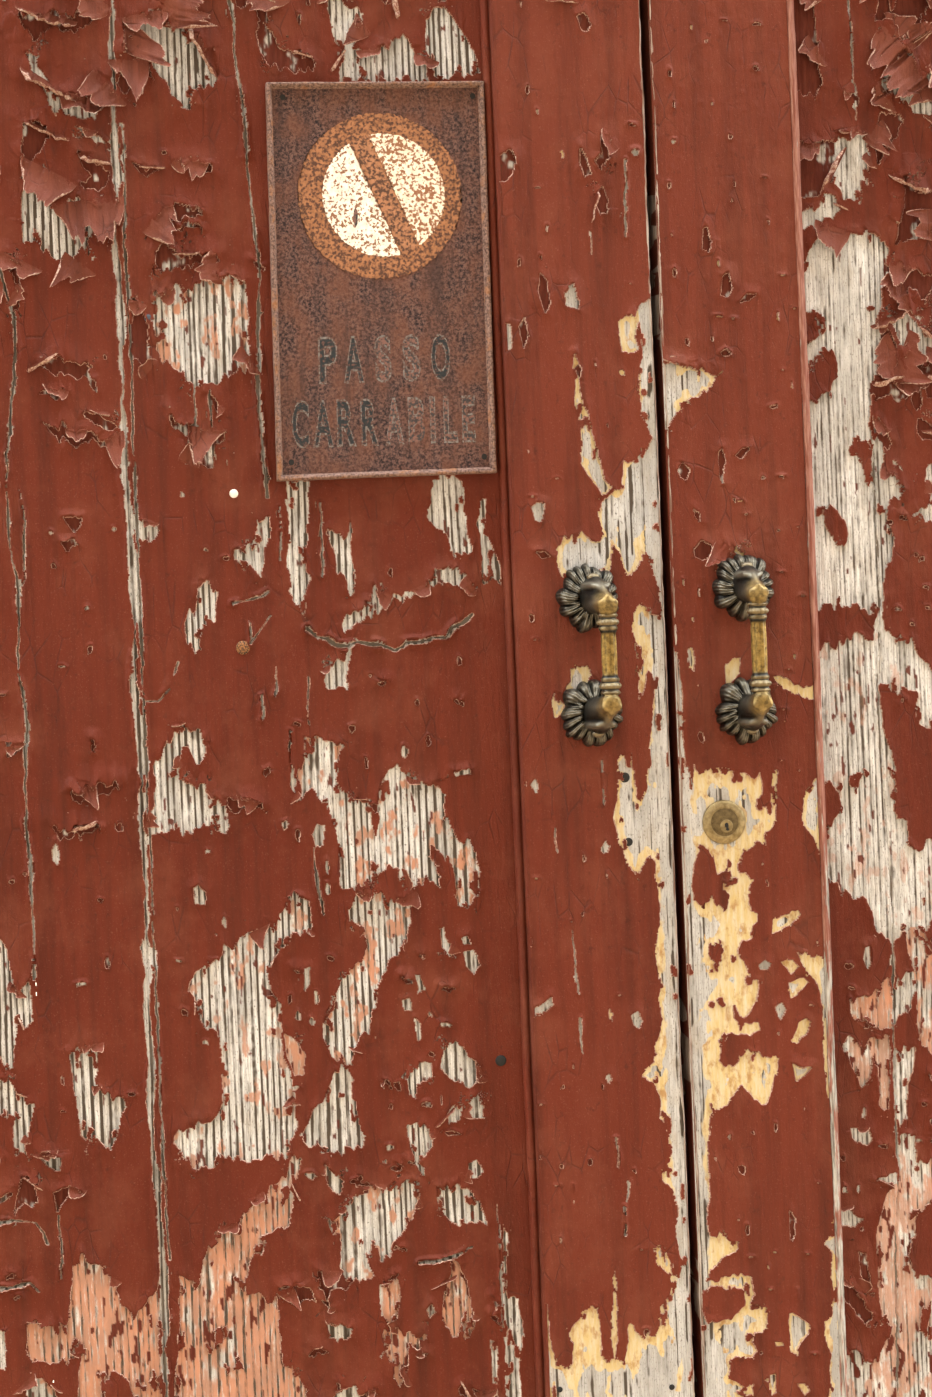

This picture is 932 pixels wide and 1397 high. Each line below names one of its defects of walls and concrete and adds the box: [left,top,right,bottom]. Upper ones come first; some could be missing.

peeling [0,474,560,1397]
peeling [498,140,542,188]
peeling [505,251,587,357]
peeling [526,0,932,1397]